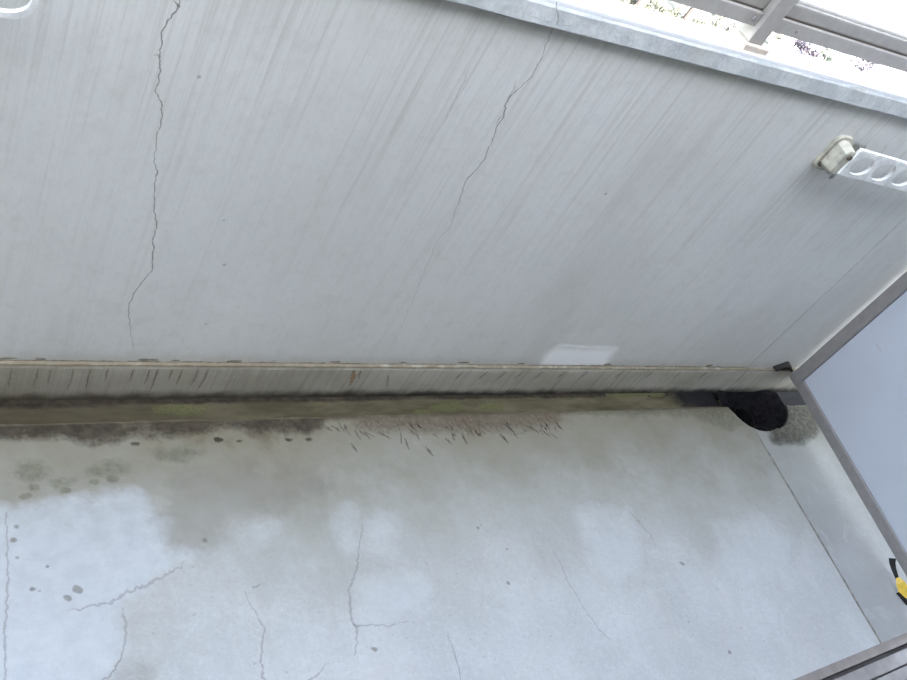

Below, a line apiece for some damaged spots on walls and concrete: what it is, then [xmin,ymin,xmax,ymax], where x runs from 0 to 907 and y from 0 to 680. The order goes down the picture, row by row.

crack [128,0,180,348]
crack [393,2,559,343]
water stain [0,392,747,680]
water stain [770,406,818,445]